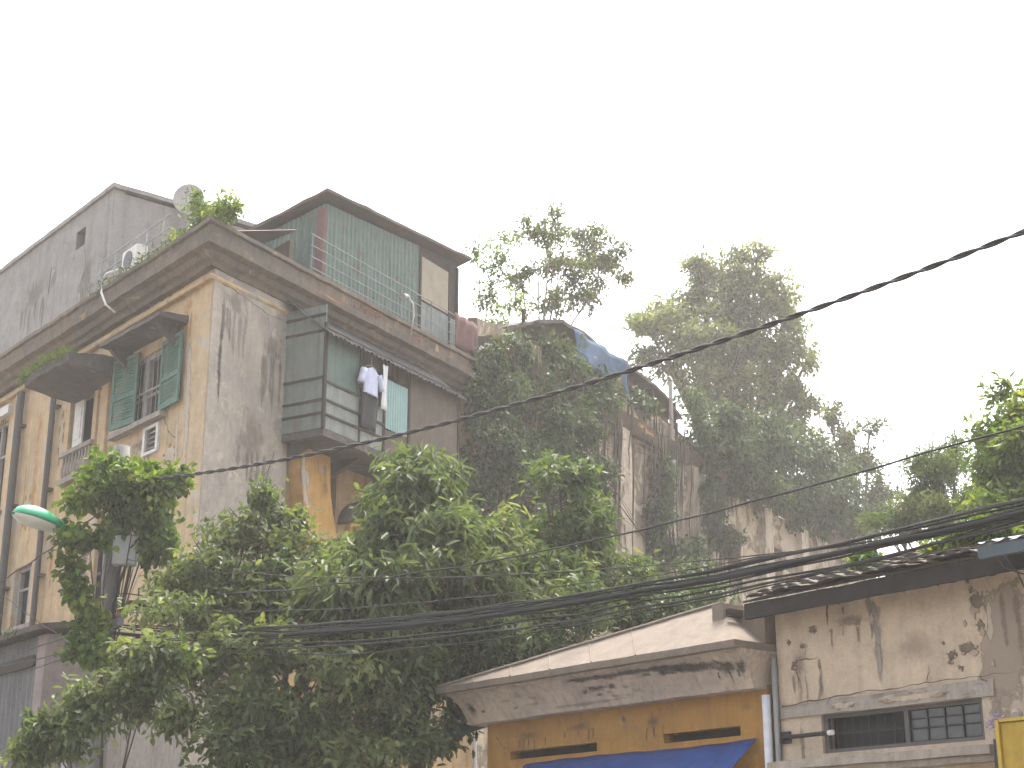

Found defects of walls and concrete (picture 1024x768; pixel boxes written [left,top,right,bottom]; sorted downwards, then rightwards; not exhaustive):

leakage [218,296,247,398]
leakage [261,338,281,406]
leakage [567,661,745,696]
leakage [843,598,882,678]
spalling [940,577,1024,705]